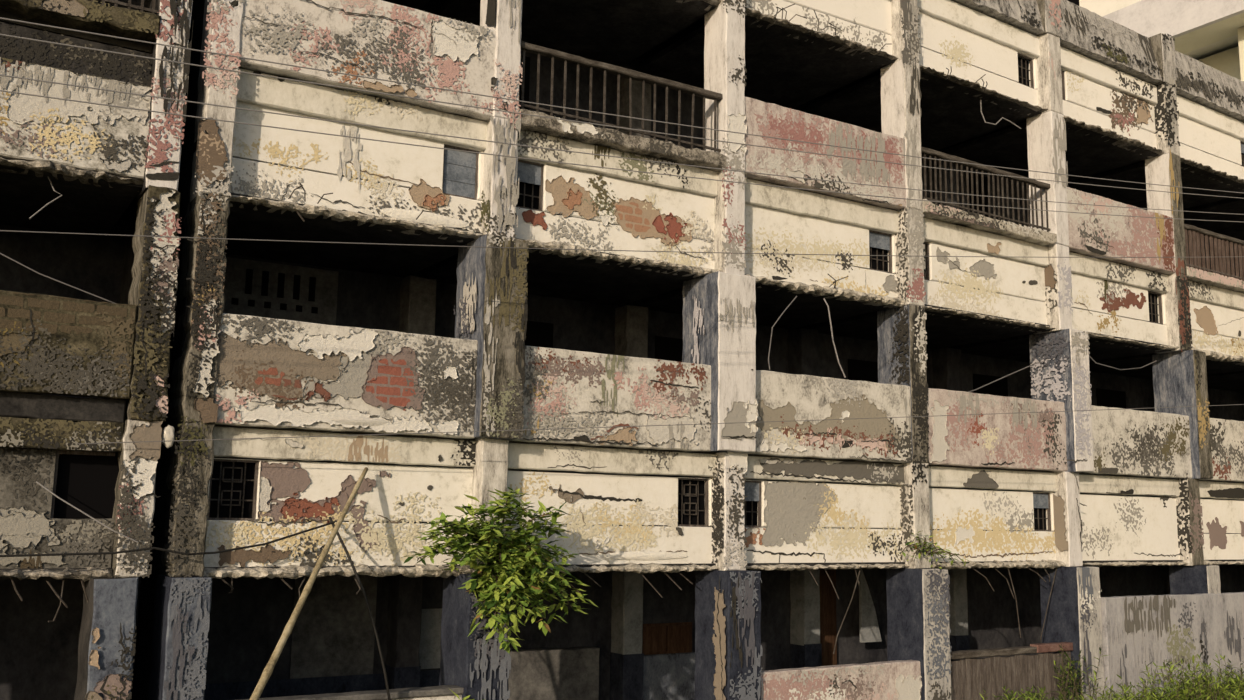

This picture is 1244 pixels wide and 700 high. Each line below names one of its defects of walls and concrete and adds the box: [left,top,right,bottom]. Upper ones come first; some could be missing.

water stain [0,0,193,172]
flaking render [194,306,425,424]
flaking render [170,459,476,608]
spalling [0,34,722,278]
water stain [207,0,624,468]
flaking render [542,394,910,700]
water stain [651,0,1007,570]
spalling [745,268,1056,375]
water stain [948,331,1192,560]
peeling [942,289,1244,488]
water stain [1061,6,1244,479]
water stain [1078,495,1244,699]